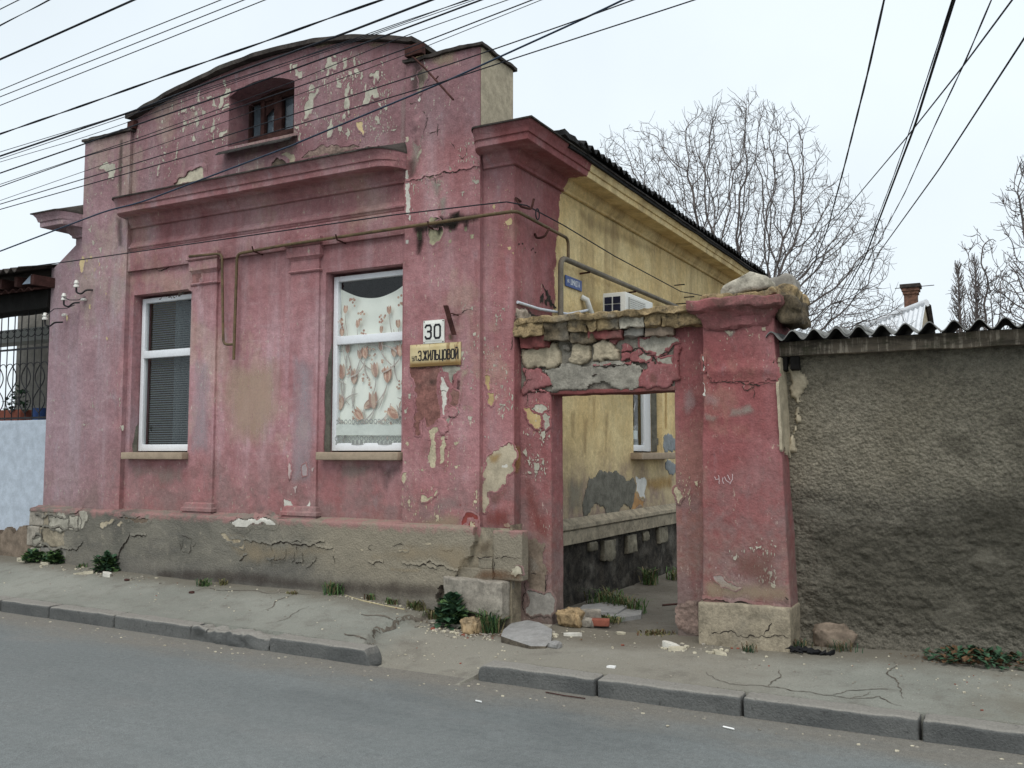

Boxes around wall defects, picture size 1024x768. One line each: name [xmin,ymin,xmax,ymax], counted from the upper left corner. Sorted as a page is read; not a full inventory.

flaking render [269,52,397,166]
peeling [142,80,232,185]
flaking render [400,305,681,537]
flaking render [32,509,152,547]
crack [116,532,146,560]
flaking render [227,497,294,534]
crack [239,537,335,568]
crack [344,612,431,645]
crack [700,595,788,638]
crack [706,661,902,706]